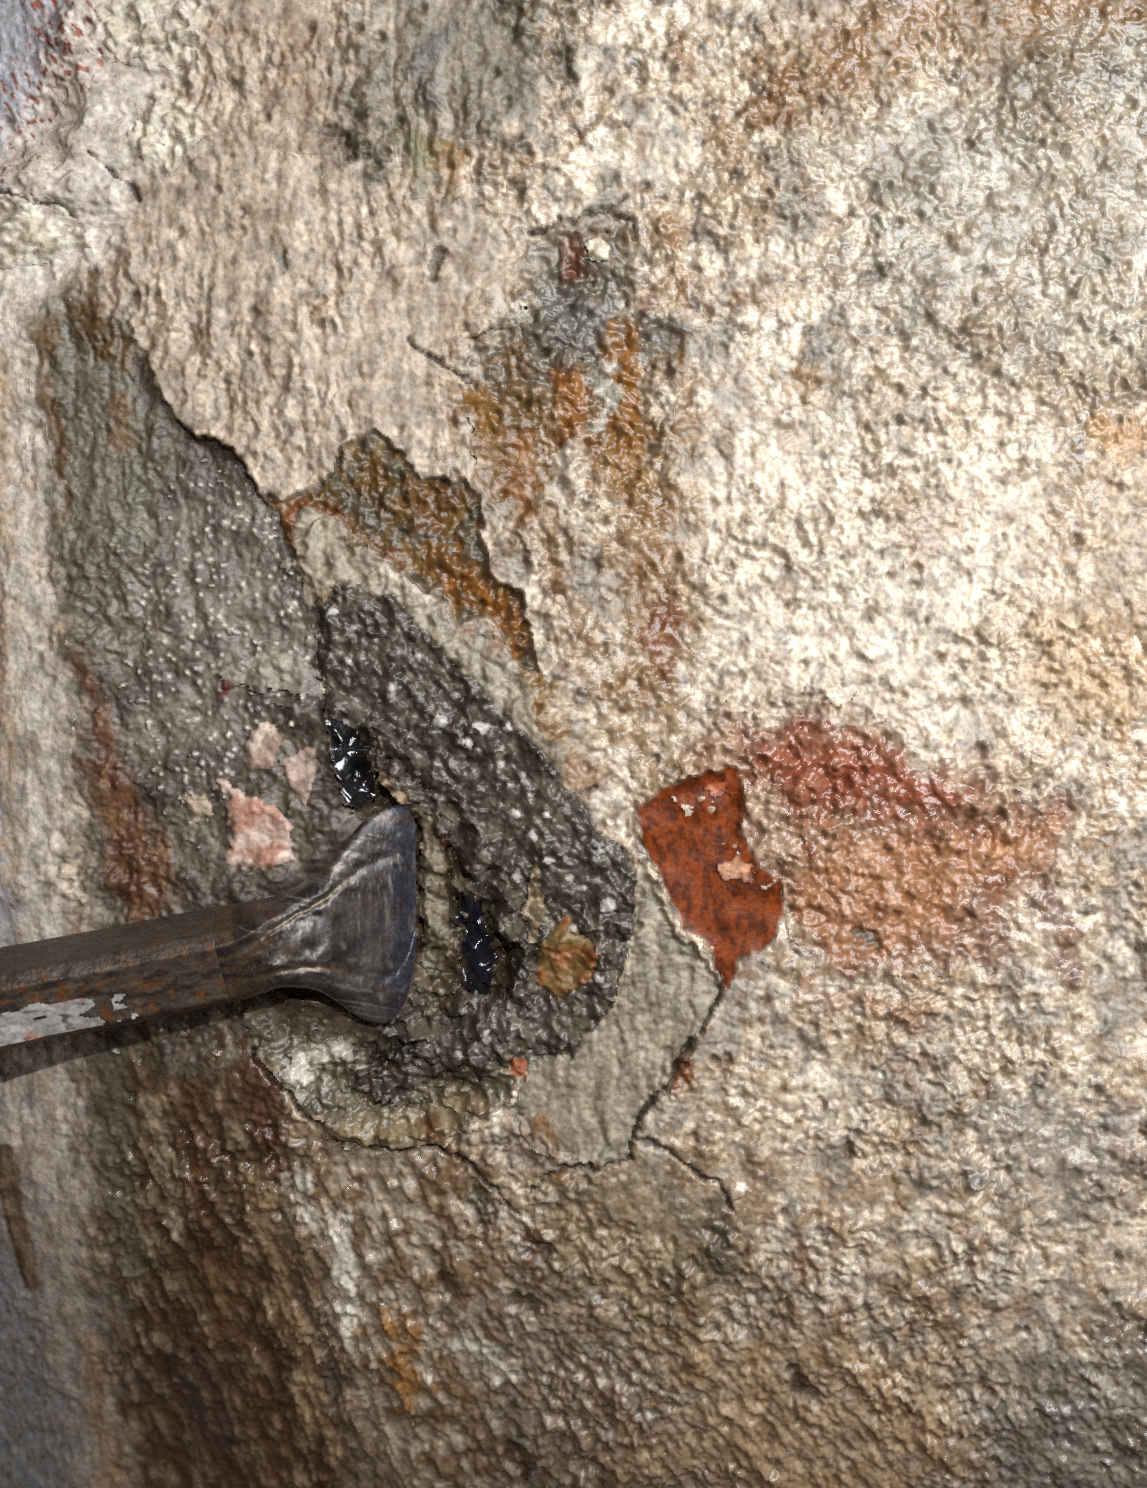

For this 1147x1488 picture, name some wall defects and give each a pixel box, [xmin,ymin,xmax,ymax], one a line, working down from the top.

spalling [0,179,714,936]
rust [511,420,730,806]
spalling [0,765,788,1185]
damp [672,683,1147,1243]
damp [50,1001,765,1488]
damp [952,1255,1147,1488]